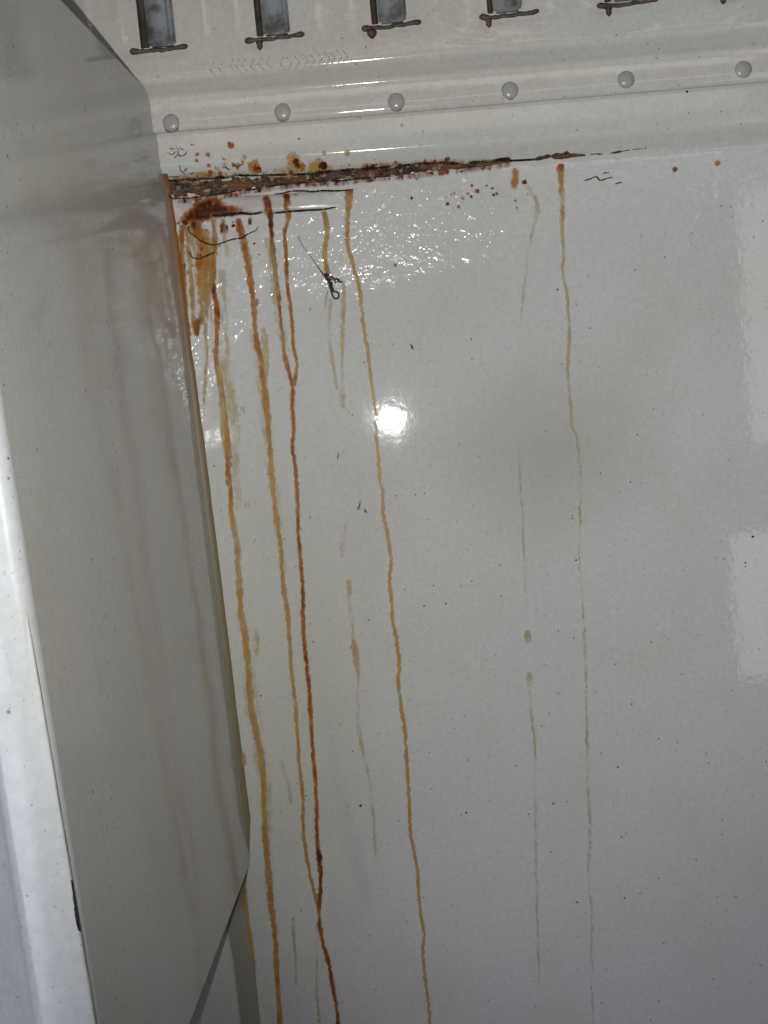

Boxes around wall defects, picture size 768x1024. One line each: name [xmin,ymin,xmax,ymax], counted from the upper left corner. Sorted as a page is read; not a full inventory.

crack [167,143,542,259]
corrosion [511,168,528,209]
corrosion [557,164,571,375]
corrosion [175,150,431,1024]